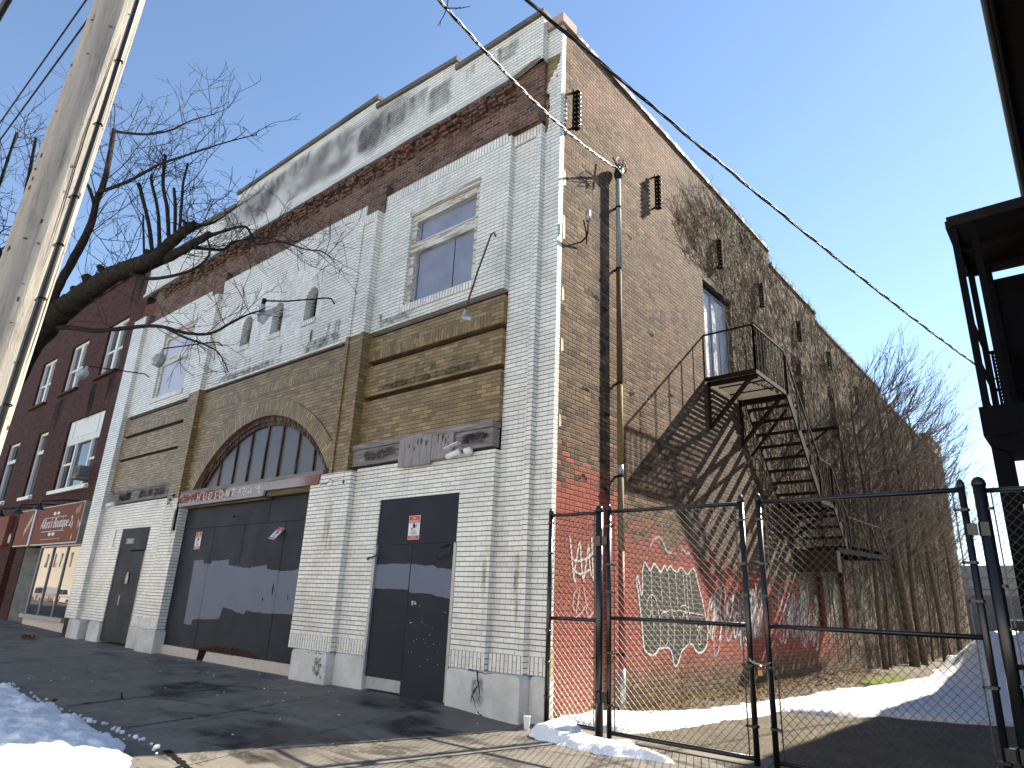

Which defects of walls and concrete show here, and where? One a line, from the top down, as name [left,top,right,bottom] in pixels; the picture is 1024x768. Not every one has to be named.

crack [468,669,493,716]